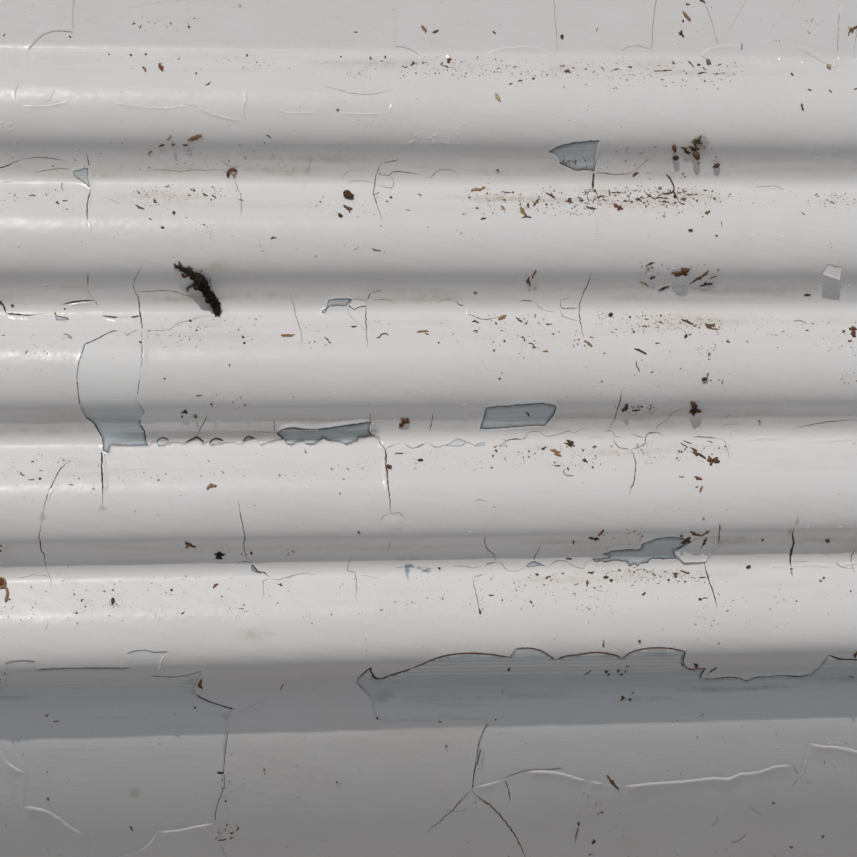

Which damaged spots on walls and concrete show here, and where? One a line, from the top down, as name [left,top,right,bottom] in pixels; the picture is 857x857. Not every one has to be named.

peeling [545,134,647,205]
peeling [0,300,98,322]
peeling [70,315,594,505]
peeling [524,529,719,572]
peeling [0,642,240,857]
peeling [347,639,857,801]
crack [429,781,525,856]